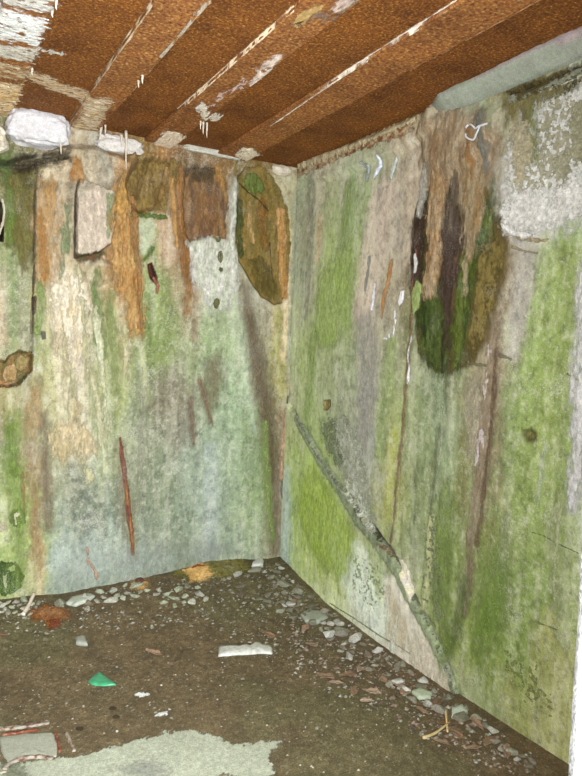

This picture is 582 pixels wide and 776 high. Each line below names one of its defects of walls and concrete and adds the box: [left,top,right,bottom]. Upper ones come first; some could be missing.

corrosion [297,114,419,177]
damp [504,65,582,161]
spalling [125,158,291,312]
damp [416,114,489,368]
corrosion [119,437,136,556]
damp [320,312,375,536]
crack [279,396,460,694]